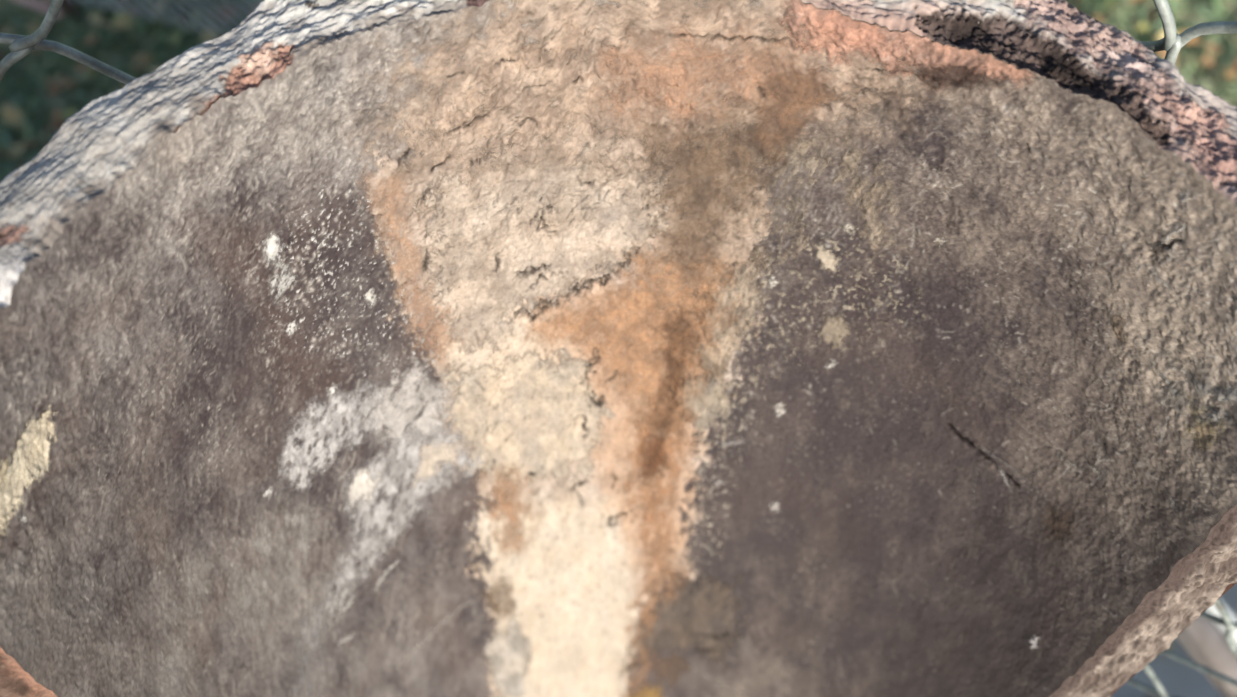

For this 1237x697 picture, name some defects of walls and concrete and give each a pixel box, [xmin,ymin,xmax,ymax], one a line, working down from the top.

crack [514,252,637,321]
rust [536,115,778,697]
efflorescence [238,488,312,629]
efflorescence [279,364,480,687]
rust [492,478,523,550]
rust [487,583,515,618]
spalling [0,647,57,697]